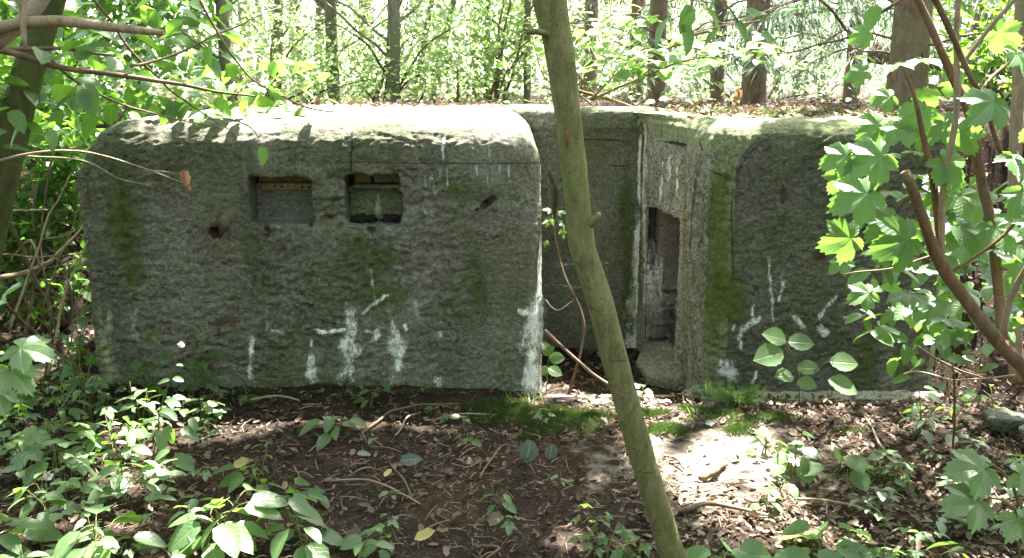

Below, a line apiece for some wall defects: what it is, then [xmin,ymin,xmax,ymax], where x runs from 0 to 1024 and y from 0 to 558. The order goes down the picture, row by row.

damp [246,336,255,380]
damp [305,275,408,383]
damp [517,242,546,396]
damp [717,359,738,382]
damp [731,265,785,349]
damp [793,298,836,337]